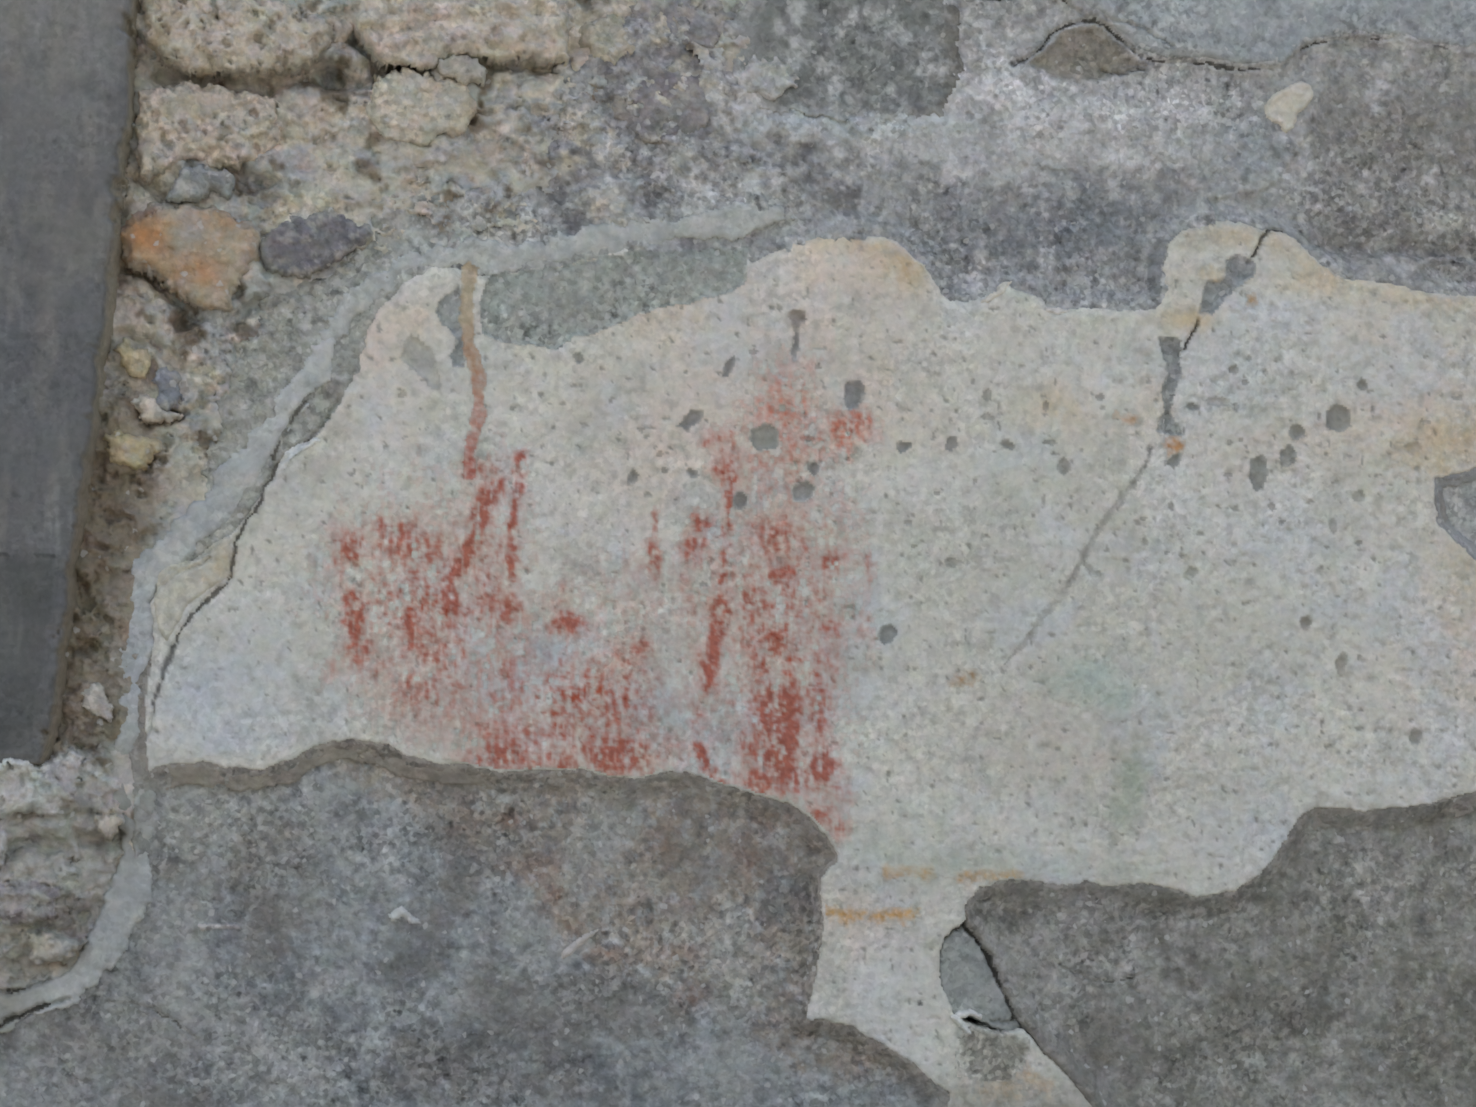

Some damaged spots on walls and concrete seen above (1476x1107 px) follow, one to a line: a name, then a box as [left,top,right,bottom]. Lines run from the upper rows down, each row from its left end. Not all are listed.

crack [1251,229,1283,257]
flaking render [277,437,320,471]
spalling [399,284,465,389]
rust [458,261,488,480]
spalling [479,246,751,364]
spalling [981,388,995,420]
spalling [1042,440,1071,476]
crack [1183,327,1197,350]
peeling [292,310,912,847]
crack [1004,446,1153,665]